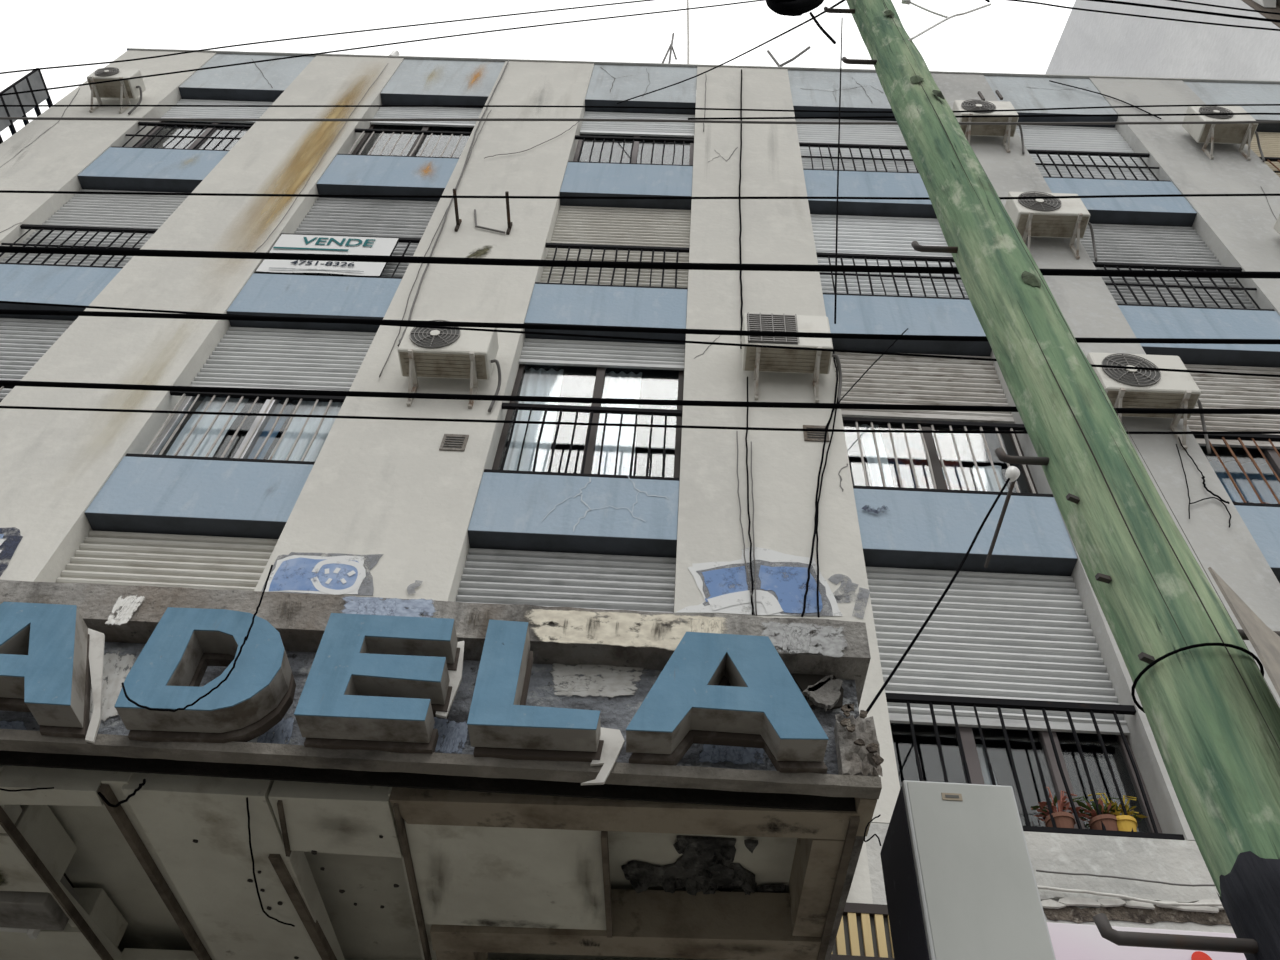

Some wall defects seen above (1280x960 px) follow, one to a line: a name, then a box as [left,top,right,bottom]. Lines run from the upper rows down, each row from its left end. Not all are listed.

corrosion [260,96,357,225]
peeling [550,663,643,697]
peeling [761,621,848,657]
spalling [791,673,884,766]